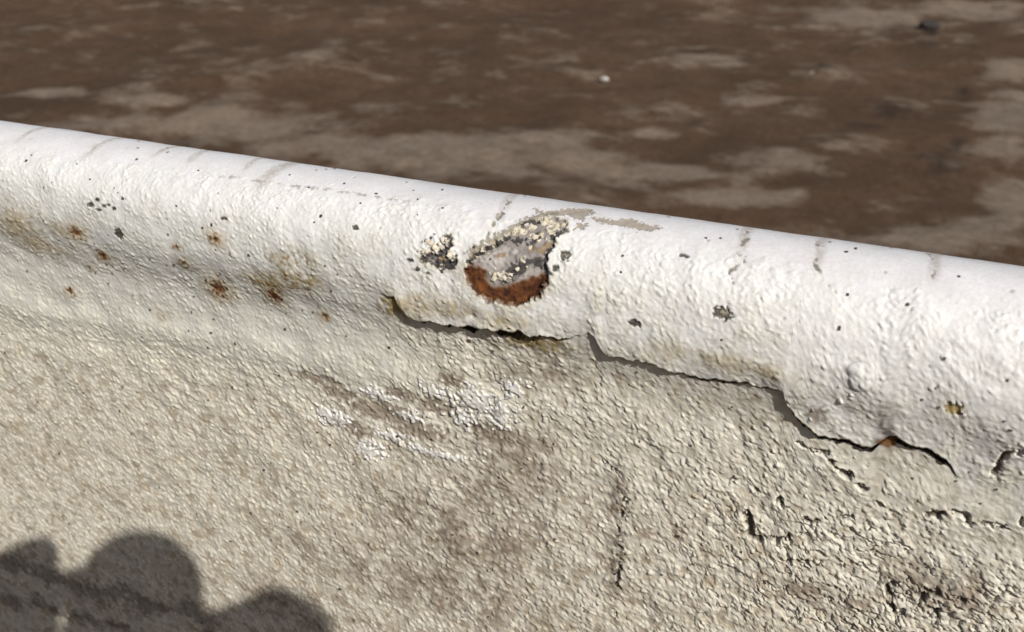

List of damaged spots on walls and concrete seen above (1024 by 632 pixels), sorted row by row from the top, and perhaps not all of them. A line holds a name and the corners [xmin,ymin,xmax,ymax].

rust [255,270,313,301]
crack [379,296,567,352]
spalling [407,208,663,306]
crack [594,338,1023,528]